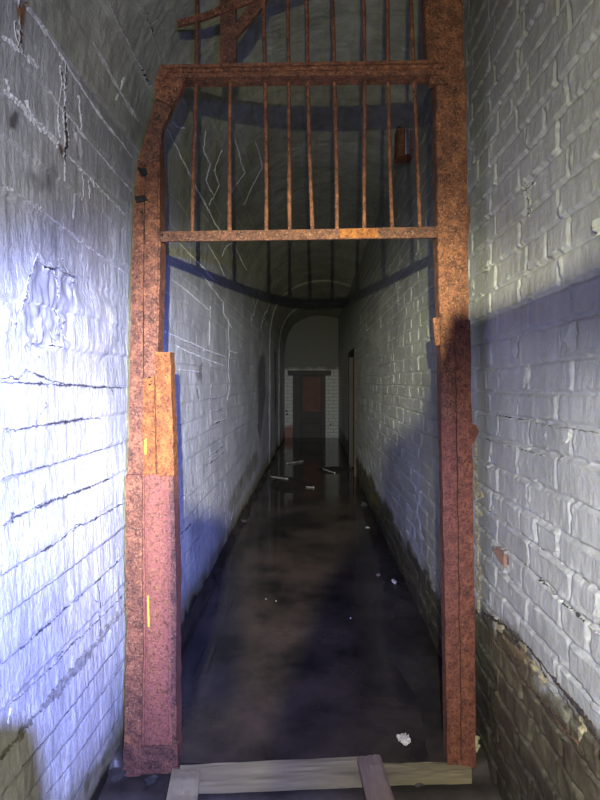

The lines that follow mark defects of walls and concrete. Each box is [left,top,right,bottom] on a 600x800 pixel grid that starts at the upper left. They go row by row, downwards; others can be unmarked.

crack [14,0,24,52]
crack [57,63,90,201]
rust [340,228,378,238]
crack [1,369,129,433]
crack [3,477,113,526]
crack [3,503,124,575]
rust [169,476,178,746]